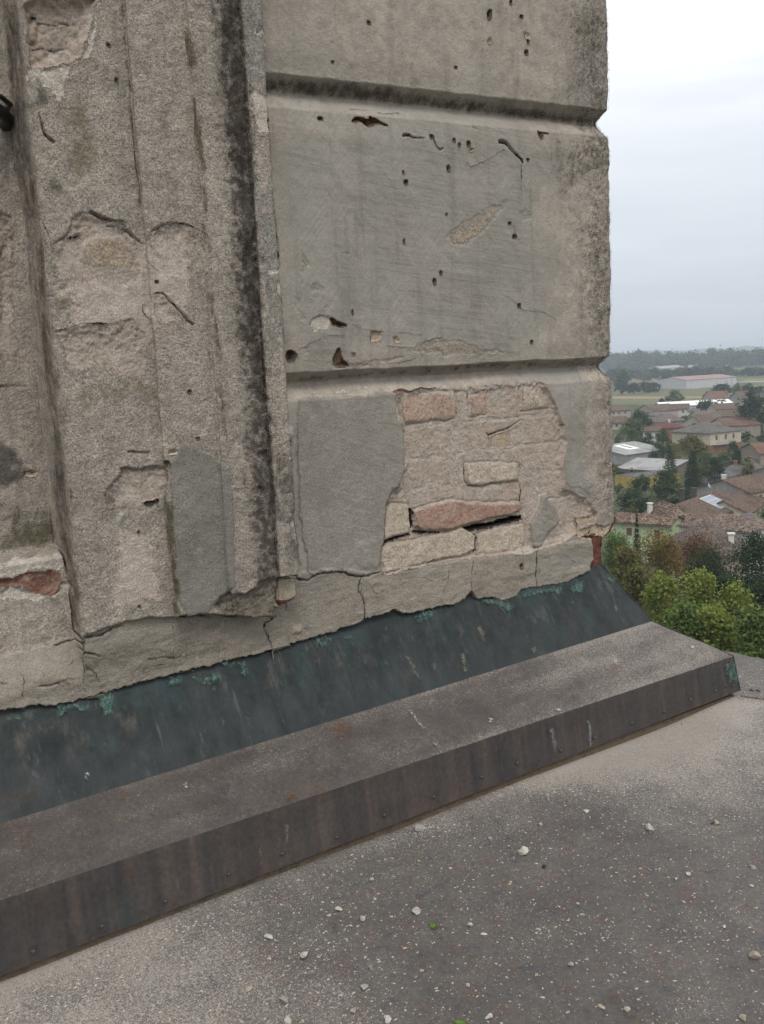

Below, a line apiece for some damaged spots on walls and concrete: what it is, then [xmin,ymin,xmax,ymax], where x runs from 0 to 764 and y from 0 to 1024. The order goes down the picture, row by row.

spalling [22,0,104,101]
damp [184,31,197,65]
damp [193,100,207,169]
damp [210,0,259,204]
crack [470,142,523,190]
peeling [51,209,201,383]
spalling [333,348,356,368]
damp [238,222,301,566]
spalling [379,380,616,575]
peeling [0,552,71,602]
crack [298,571,383,618]
crack [139,615,222,673]